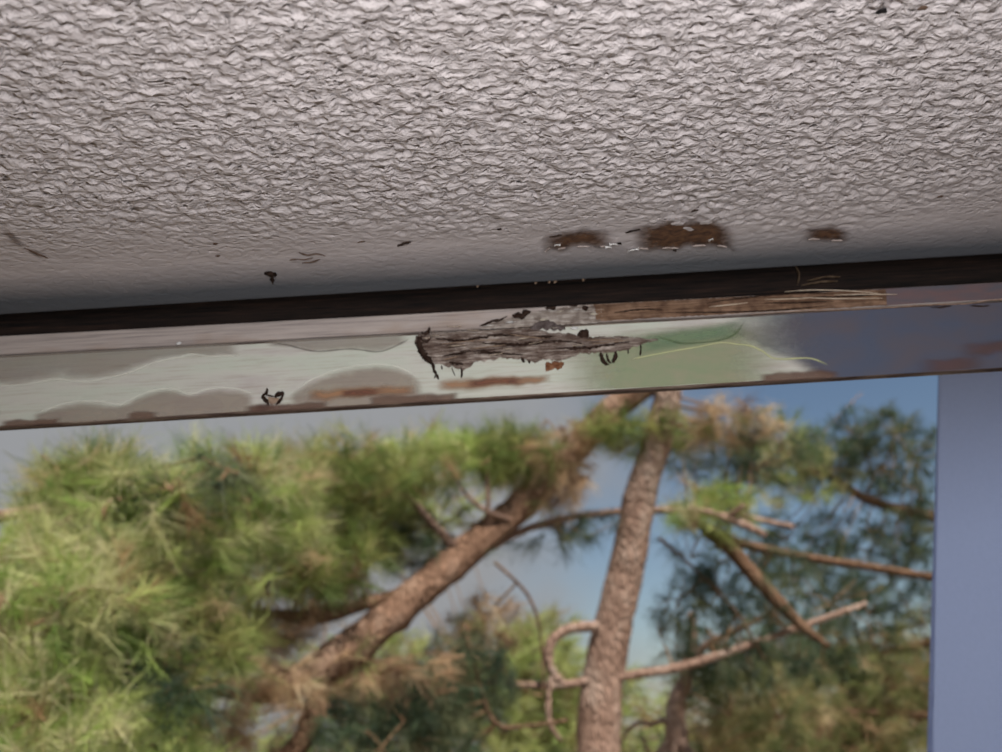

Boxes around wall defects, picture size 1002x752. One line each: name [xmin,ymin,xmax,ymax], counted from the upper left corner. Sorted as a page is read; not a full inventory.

peeling [545,209,729,253]
peeling [808,228,844,241]
peeling [545,361,564,372]